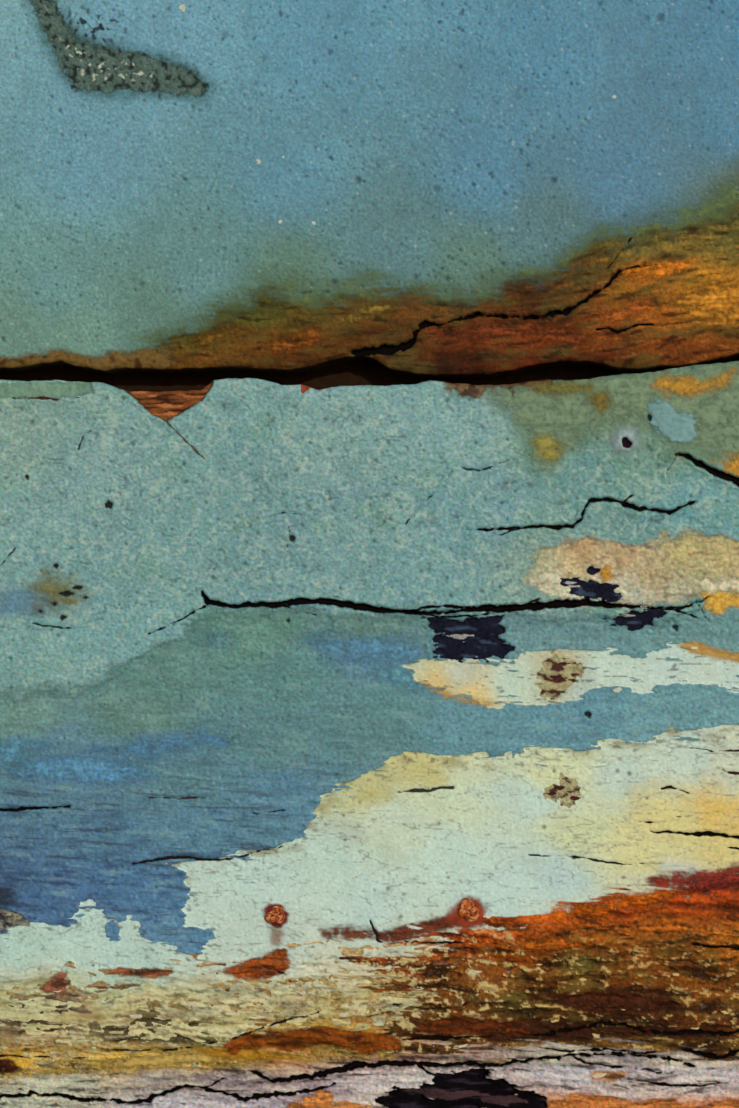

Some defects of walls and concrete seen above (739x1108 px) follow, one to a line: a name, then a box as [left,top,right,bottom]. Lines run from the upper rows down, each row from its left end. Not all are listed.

corrosion [141,180,739,377]
crack [667,453,739,487]
crack [466,495,696,535]
crack [148,591,710,634]
crack [0,804,71,812]
peeling [0,531,739,1108]
corrosion [223,866,739,1063]
crack [393,1002,468,1010]
crack [0,1011,319,1059]
crack [0,1021,739,1105]